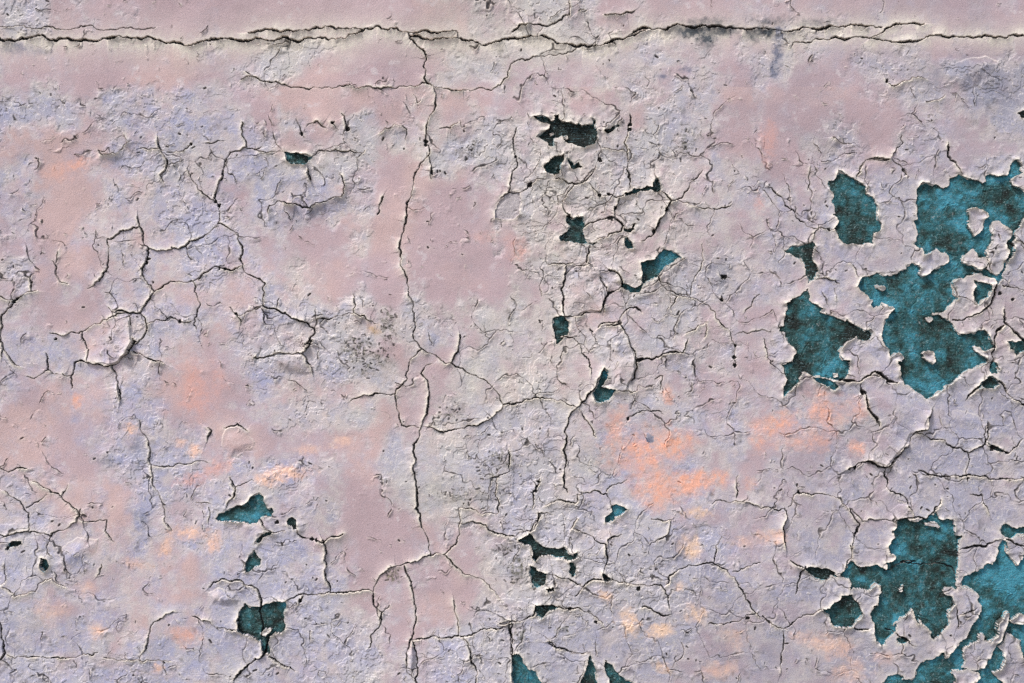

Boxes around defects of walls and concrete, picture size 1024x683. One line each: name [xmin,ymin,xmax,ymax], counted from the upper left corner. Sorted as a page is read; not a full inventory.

crack [778,22,1023,47]
spalling [528,111,621,178]
spalling [777,158,1024,399]
crack [0,0,770,683]
crack [838,371,898,426]
crack [952,284,1024,406]
spalling [216,492,274,572]
spalling [232,595,288,657]
spalling [516,526,583,621]
crack [546,519,823,667]
crack [716,409,1024,594]
spalling [804,512,1024,683]